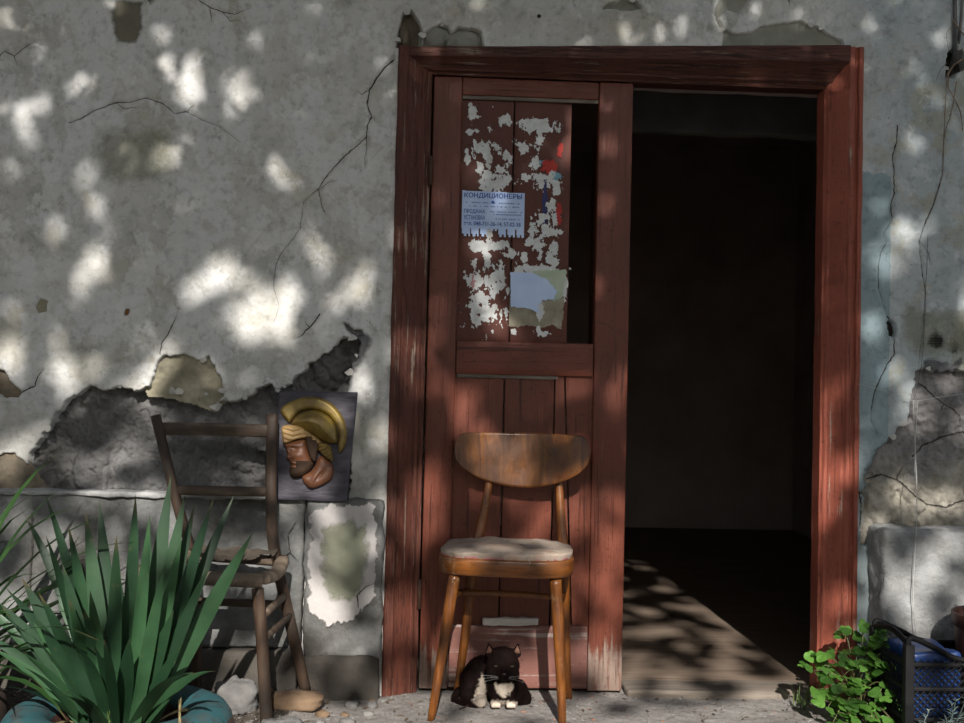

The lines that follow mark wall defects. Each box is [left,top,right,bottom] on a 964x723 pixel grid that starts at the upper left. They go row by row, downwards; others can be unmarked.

crack [199,0,245,22]
flaking render [393,8,482,48]
flaking render [603,0,640,11]
crack [69,98,235,139]
crack [273,59,395,320]
flaking render [0,323,363,491]
crack [871,125,898,438]
crack [858,176,964,529]
flaking render [859,366,964,545]